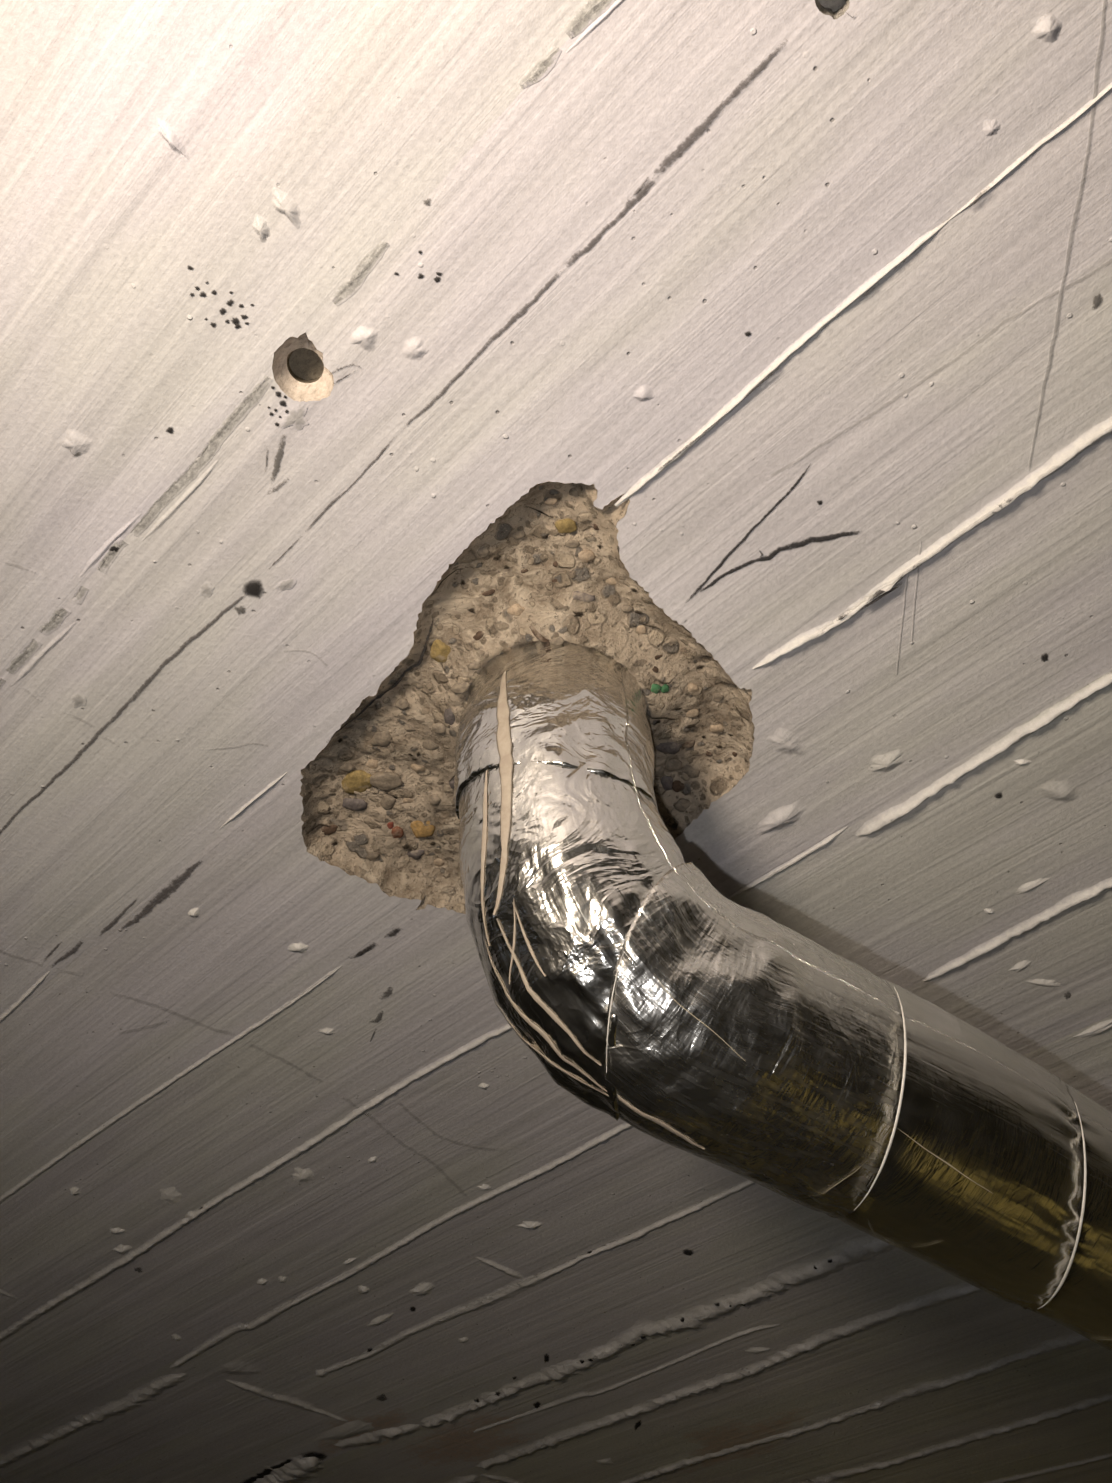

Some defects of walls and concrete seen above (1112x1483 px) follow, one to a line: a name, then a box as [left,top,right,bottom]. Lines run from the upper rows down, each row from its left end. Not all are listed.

crack [272,49,779,566]
crack [764,0,1112,513]
crack [0,596,244,834]
spalling [299,481,755,914]